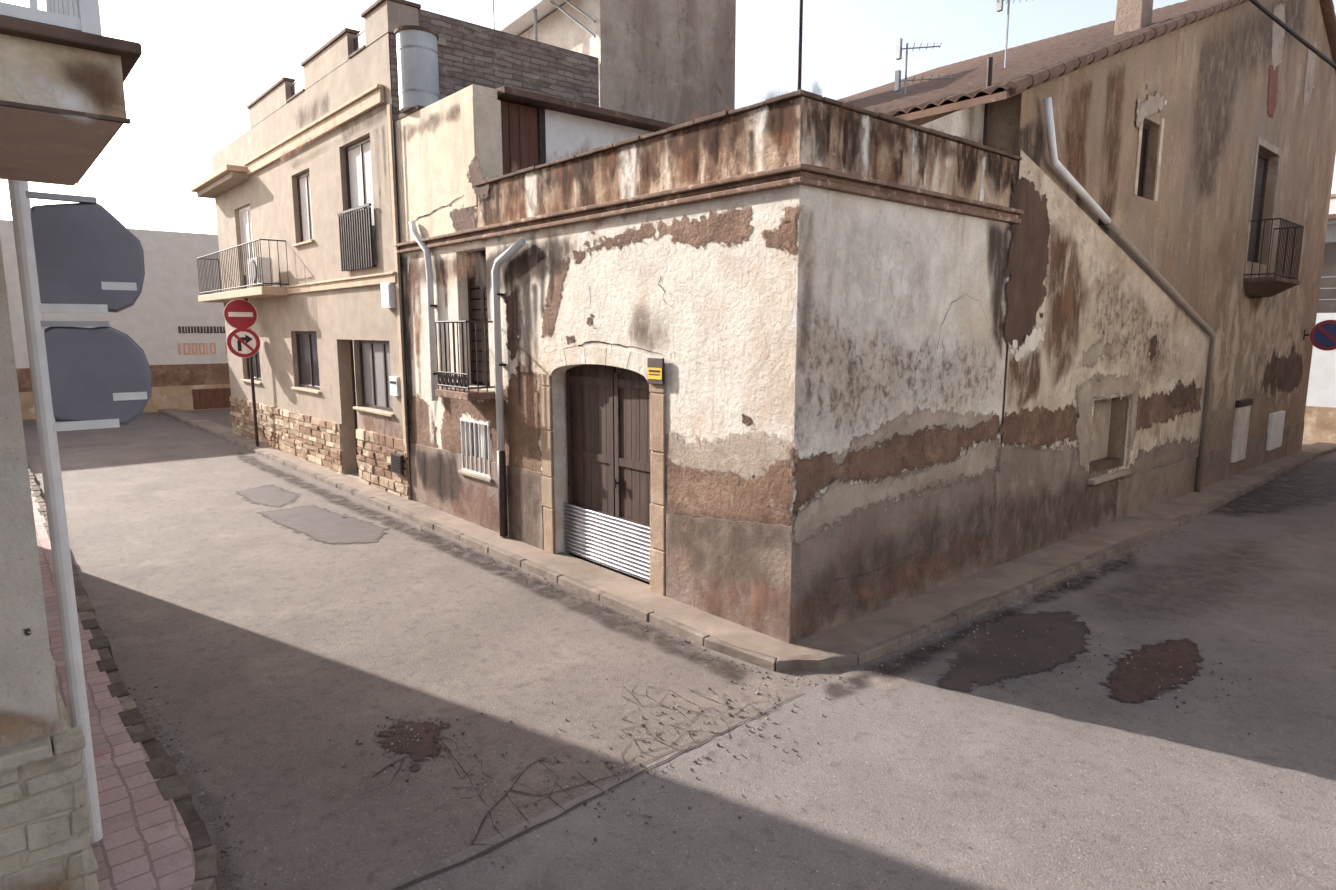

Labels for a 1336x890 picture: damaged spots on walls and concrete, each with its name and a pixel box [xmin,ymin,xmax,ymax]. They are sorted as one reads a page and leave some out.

leakage [1198,0,1302,190]
peeling [541,204,804,345]
leakage [484,71,1169,405]
leakage [799,304,992,426]
flaking render [664,335,1202,535]
peeling [1262,345,1303,397]